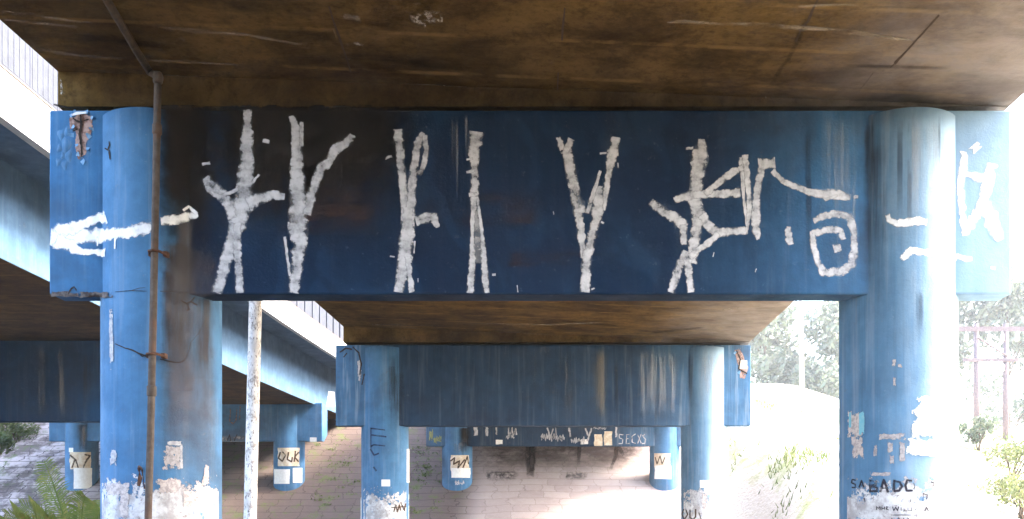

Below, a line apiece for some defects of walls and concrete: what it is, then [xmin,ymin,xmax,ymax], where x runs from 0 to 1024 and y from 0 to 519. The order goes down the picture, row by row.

crack [890,14,940,68]
spalling [68,110,94,165]
peeling [849,411,864,435]
peeling [156,441,209,506]
peeling [870,433,906,476]
peeling [105,483,129,519]